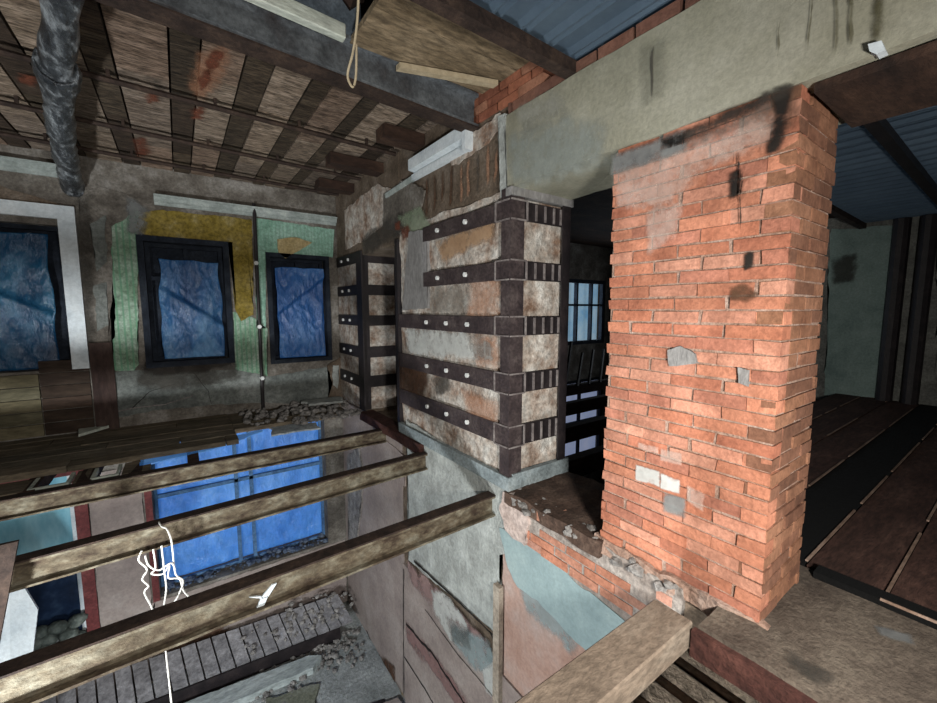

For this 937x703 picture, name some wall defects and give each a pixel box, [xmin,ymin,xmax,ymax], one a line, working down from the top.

damp [874,0,883,38]
corrosion [93,0,480,132]
peeling [450,113,508,193]
peeling [344,179,430,255]
spalling [499,488,770,651]